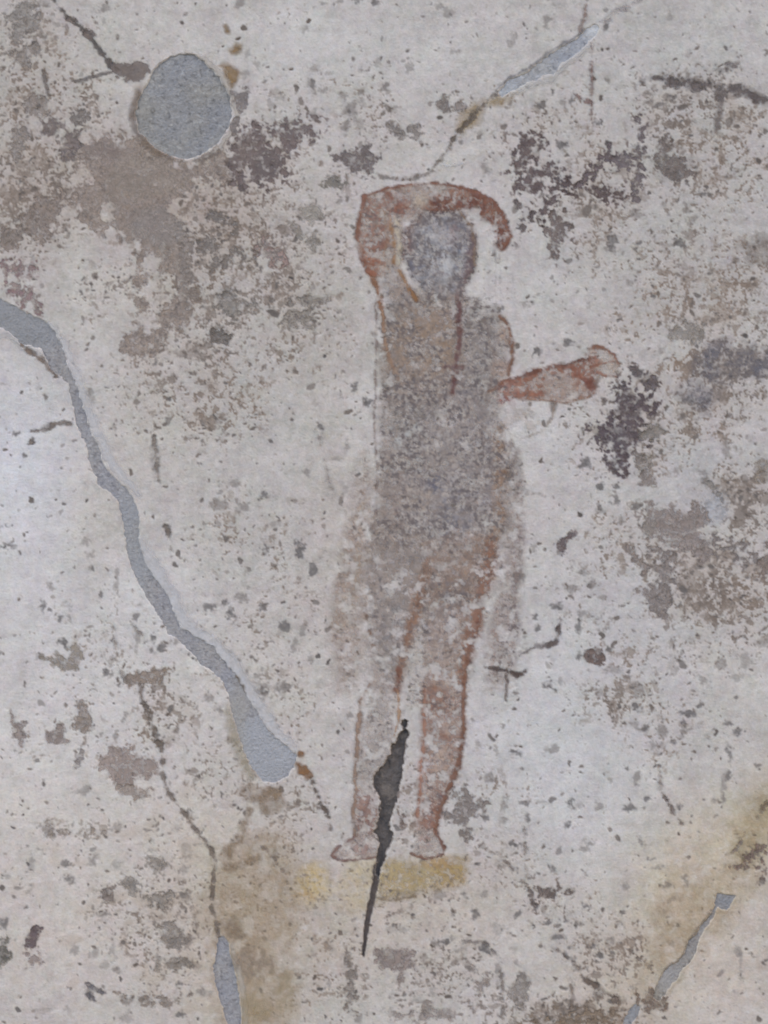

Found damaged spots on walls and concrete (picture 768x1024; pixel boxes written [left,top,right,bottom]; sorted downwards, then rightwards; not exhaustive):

peeling [0,87,318,358]
crack [0,299,332,831]
peeling [40,644,83,671]
peeling [125,668,172,686]
peeling [11,713,27,747]
peeling [46,700,92,744]
peeling [99,746,158,800]
crack [139,683,248,1024]
crack [362,865,379,956]
peeling [636,989,668,1014]